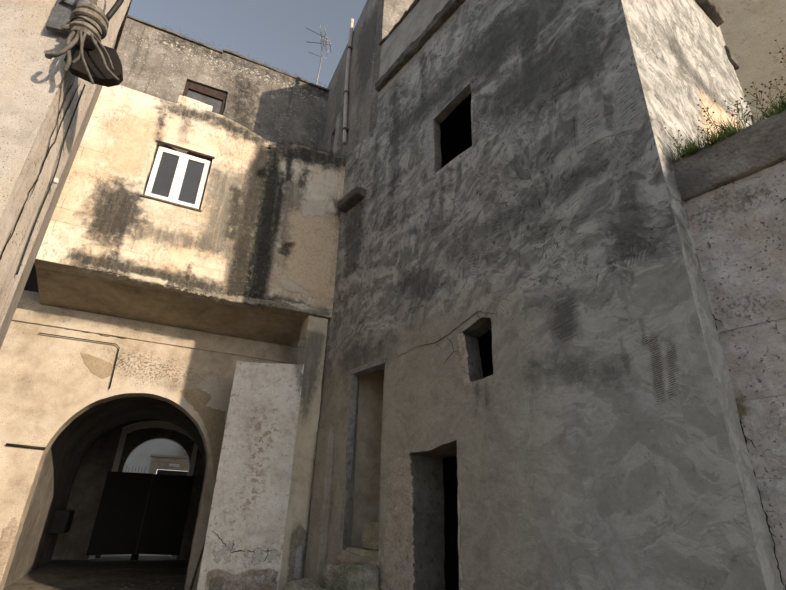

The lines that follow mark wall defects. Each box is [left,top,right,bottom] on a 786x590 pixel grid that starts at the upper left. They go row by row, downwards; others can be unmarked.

water stain [71,37,346,316]
flaking render [80,353,116,379]
crack [395,311,498,368]
flaking render [180,389,226,493]
crack [211,530,277,561]
spalling [205,524,307,590]